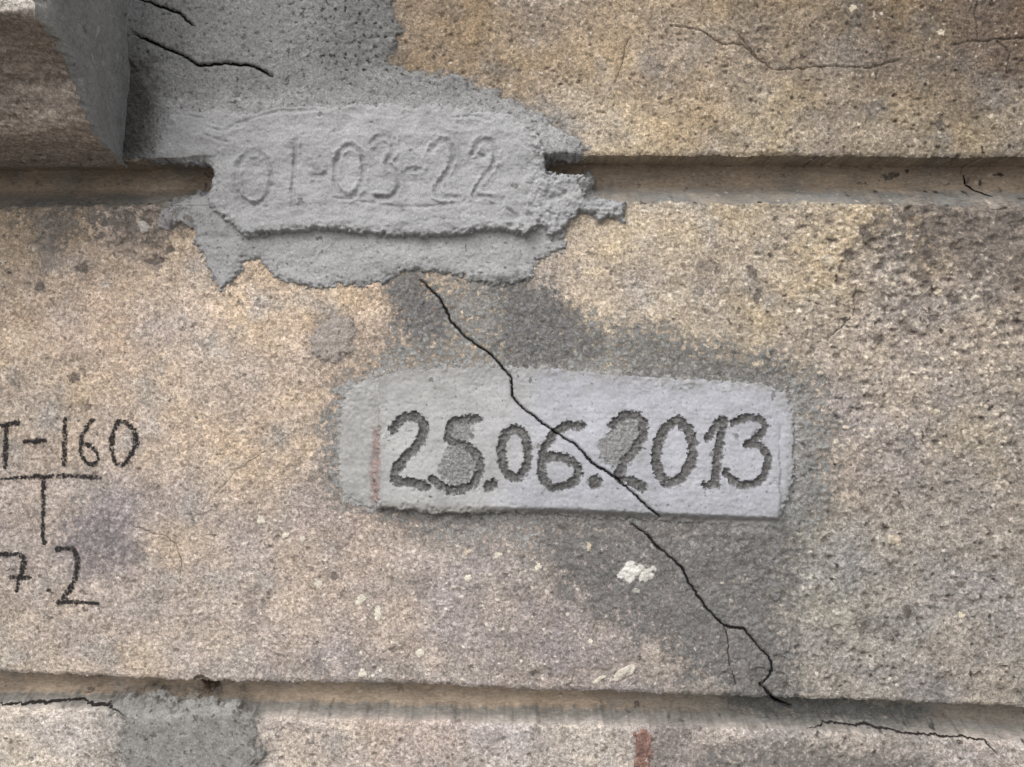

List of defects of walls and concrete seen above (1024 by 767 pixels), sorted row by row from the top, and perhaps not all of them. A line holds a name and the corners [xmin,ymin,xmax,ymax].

crack [140,0,193,26]
crack [135,34,274,77]
crack [421,281,791,706]
crack [0,697,124,716]
crack [809,720,997,754]